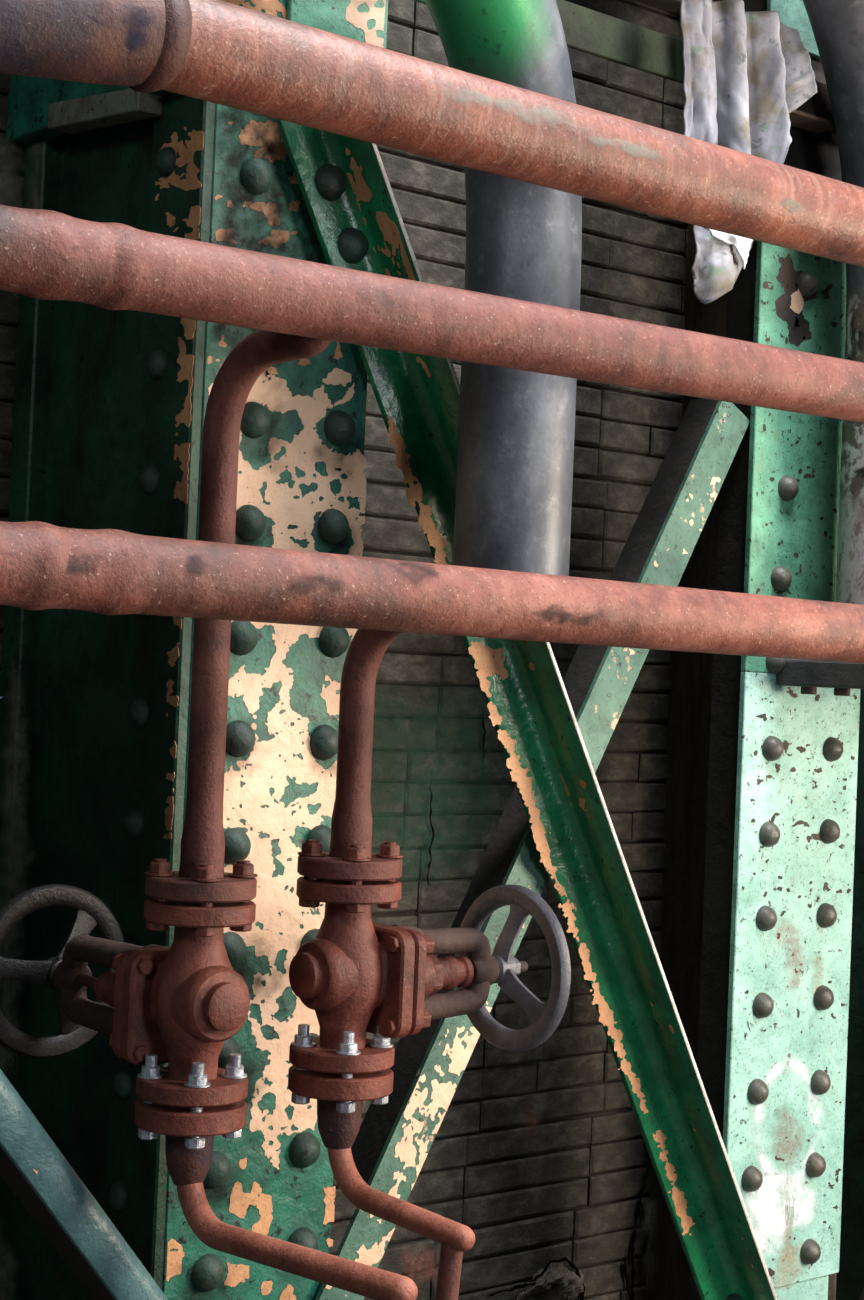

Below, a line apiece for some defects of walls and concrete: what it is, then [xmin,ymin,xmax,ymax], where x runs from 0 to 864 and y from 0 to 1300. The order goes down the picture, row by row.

peeling [345,0,385,48]
peeling [236,342,367,556]
peeling [320,675,341,721]
peeling [223,622,337,1170]
peeling [468,641,649,1114]
peeling [388,1026,480,1198]
peeling [166,1238,185,1281]
peeling [229,1157,273,1235]
peeling [224,1262,296,1300]
peeling [354,1214,395,1266]
peeling [652,1130,695,1236]
leakage [749,1161,813,1249]